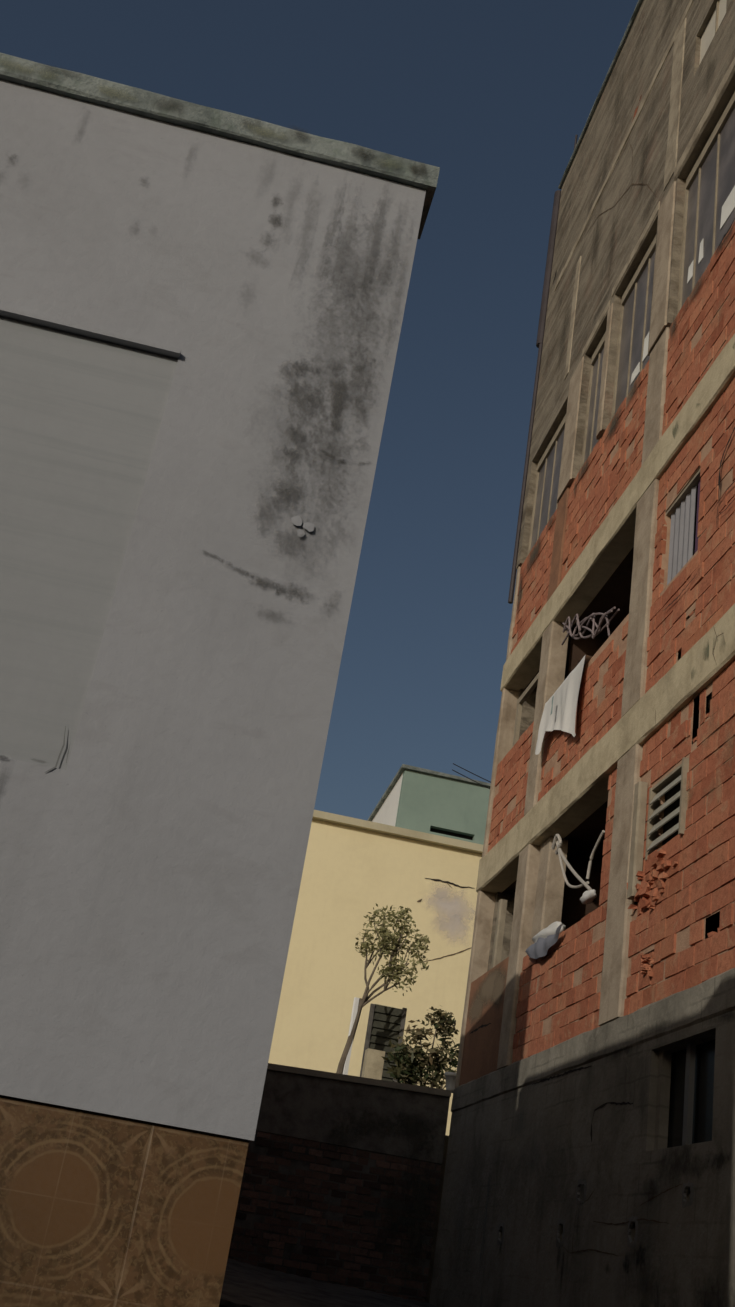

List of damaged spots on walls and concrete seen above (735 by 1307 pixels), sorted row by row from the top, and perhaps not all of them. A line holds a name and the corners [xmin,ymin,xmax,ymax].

crack [417,878,472,902]
crack [532,1066,592,1085]